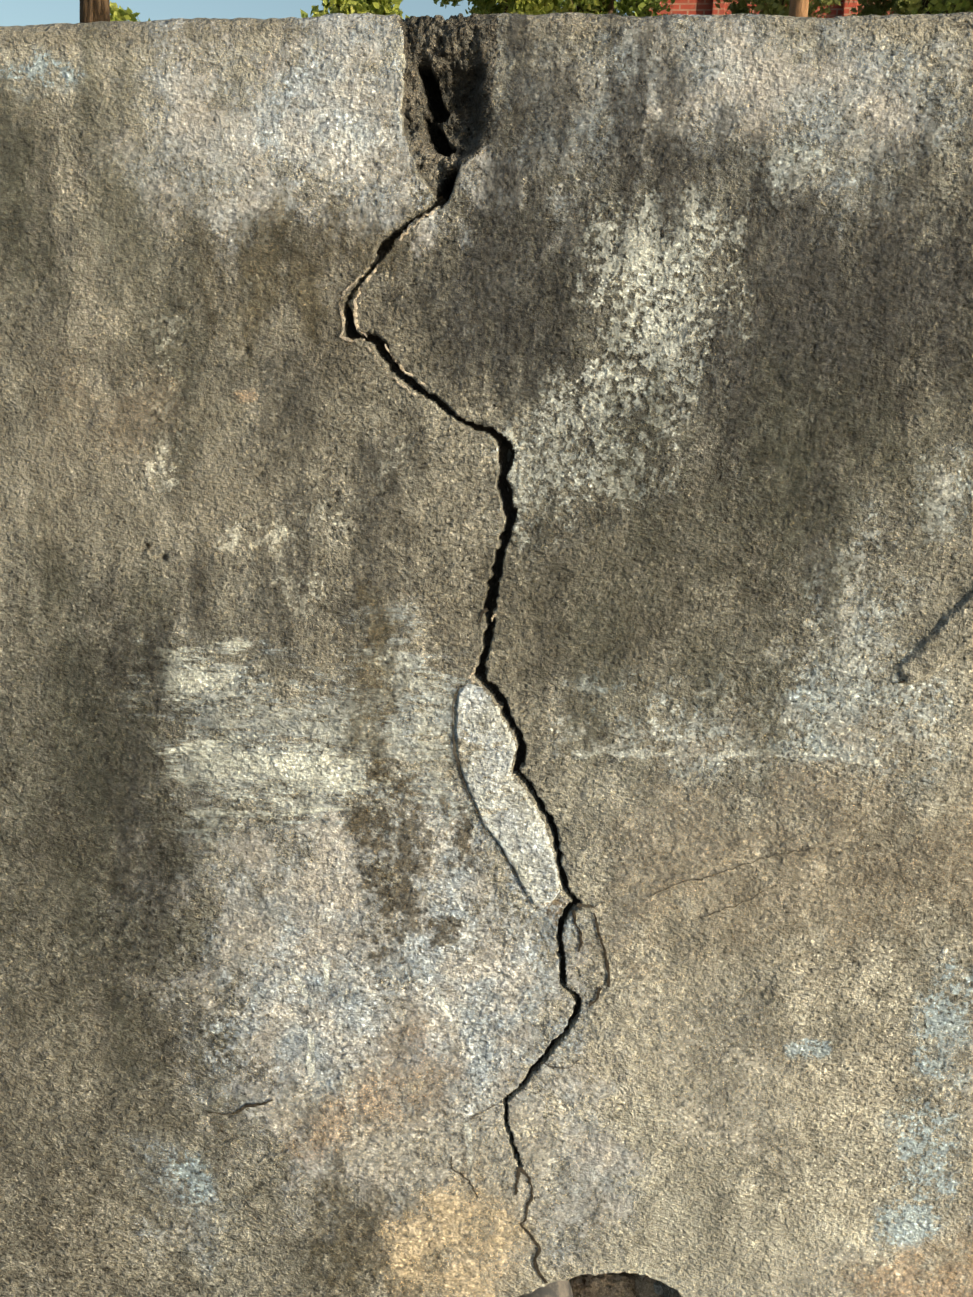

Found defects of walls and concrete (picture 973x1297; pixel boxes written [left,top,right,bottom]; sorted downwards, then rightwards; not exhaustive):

peeling [97,13,973,257]
damp [421,12,970,548]
damp [142,313,187,493]
damp [270,572,327,617]
damp [217,437,415,556]
crack [339,196,610,1284]